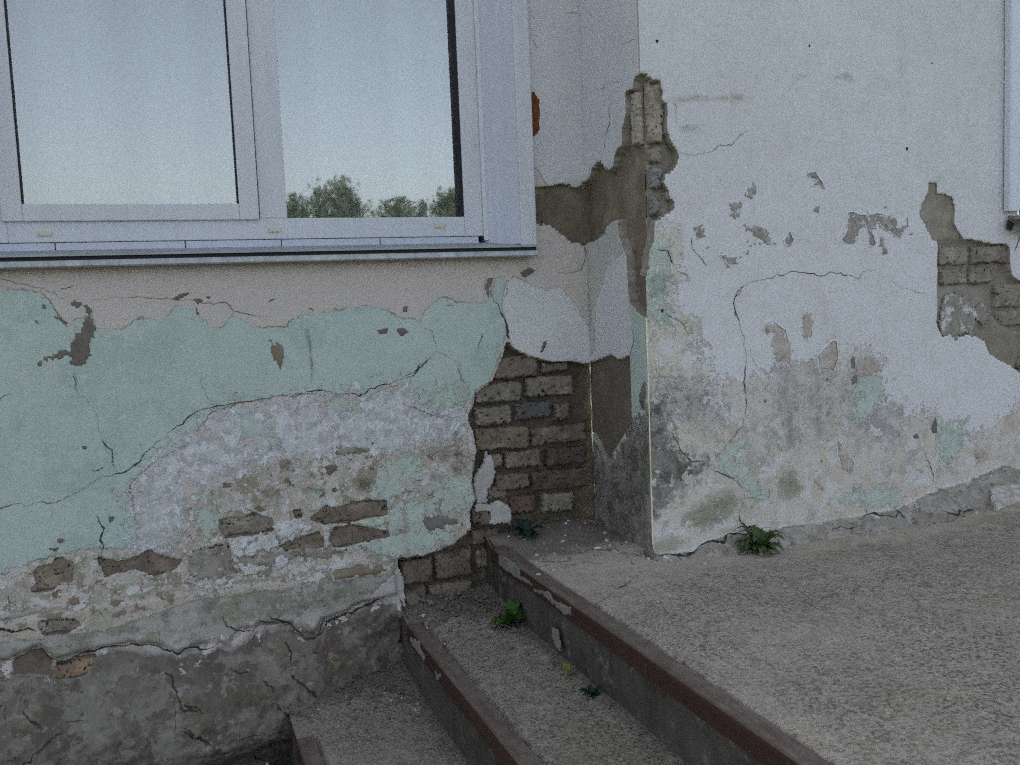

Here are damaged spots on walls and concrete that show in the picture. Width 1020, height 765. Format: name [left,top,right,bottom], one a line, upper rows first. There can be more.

peeling [37,300,96,366]
crack [478,278,509,347]
flaking render [535,81,674,310]
crack [658,239,707,280]
peeling [693,182,794,268]
flaking render [840,183,1020,373]
crack [0,328,471,509]
flaking render [97,340,646,616]
crack [540,269,928,605]
flaking render [31,538,74,592]
crack [0,705,83,765]
crack [0,596,389,745]